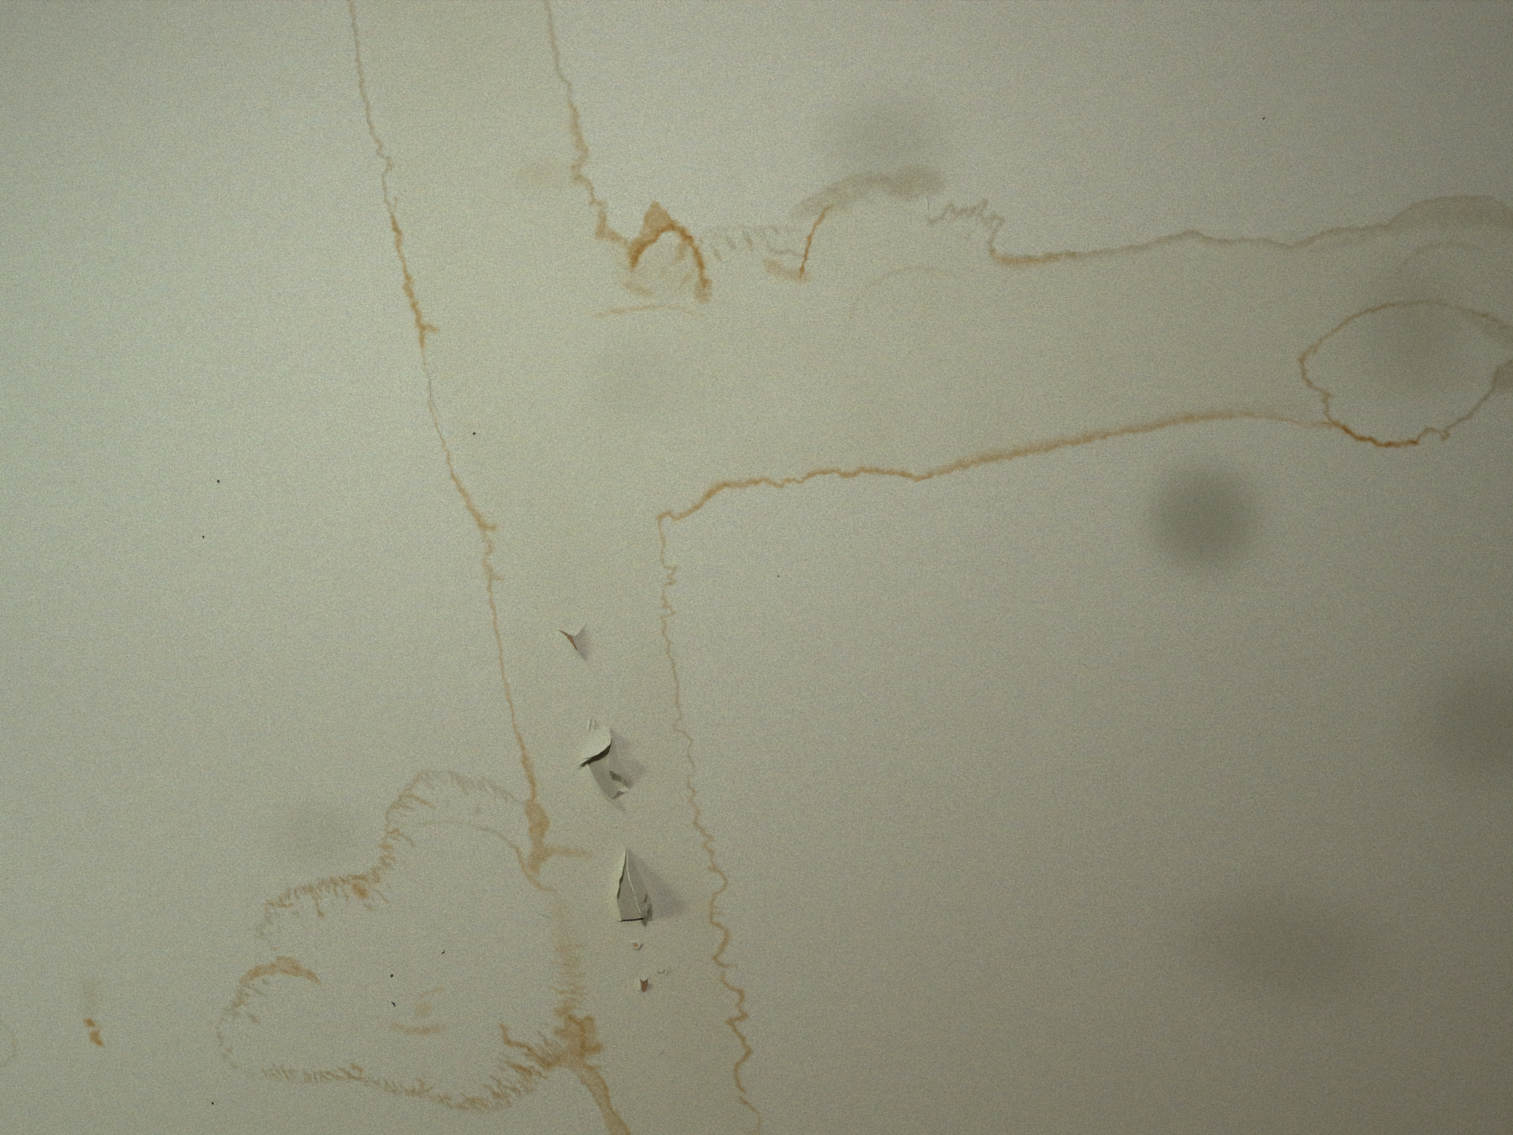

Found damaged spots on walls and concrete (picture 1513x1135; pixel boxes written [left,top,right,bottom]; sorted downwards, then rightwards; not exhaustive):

leakage [575,328,705,438]
leakage [205,0,632,1135]
peeling [545,616,587,665]
leakage [653,73,1513,1135]
peeling [572,717,632,816]
peeling [599,838,655,931]